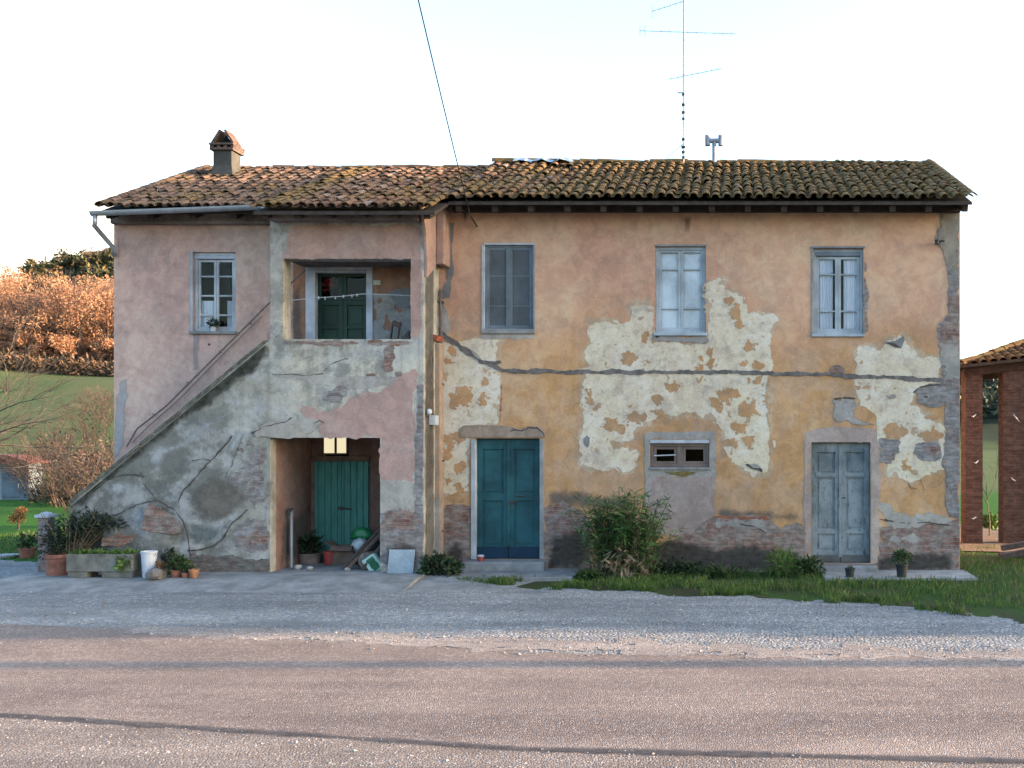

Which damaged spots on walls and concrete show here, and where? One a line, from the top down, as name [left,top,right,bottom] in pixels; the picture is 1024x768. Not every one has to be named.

flaking render [101,504,181,547]
crack [96,417,324,553]
flaking render [323,384,348,403]
flaking render [270,221,411,376]
flaking render [380,337,505,564]
flaking render [576,275,779,479]
crack [442,331,944,382]
flaking render [830,213,959,570]